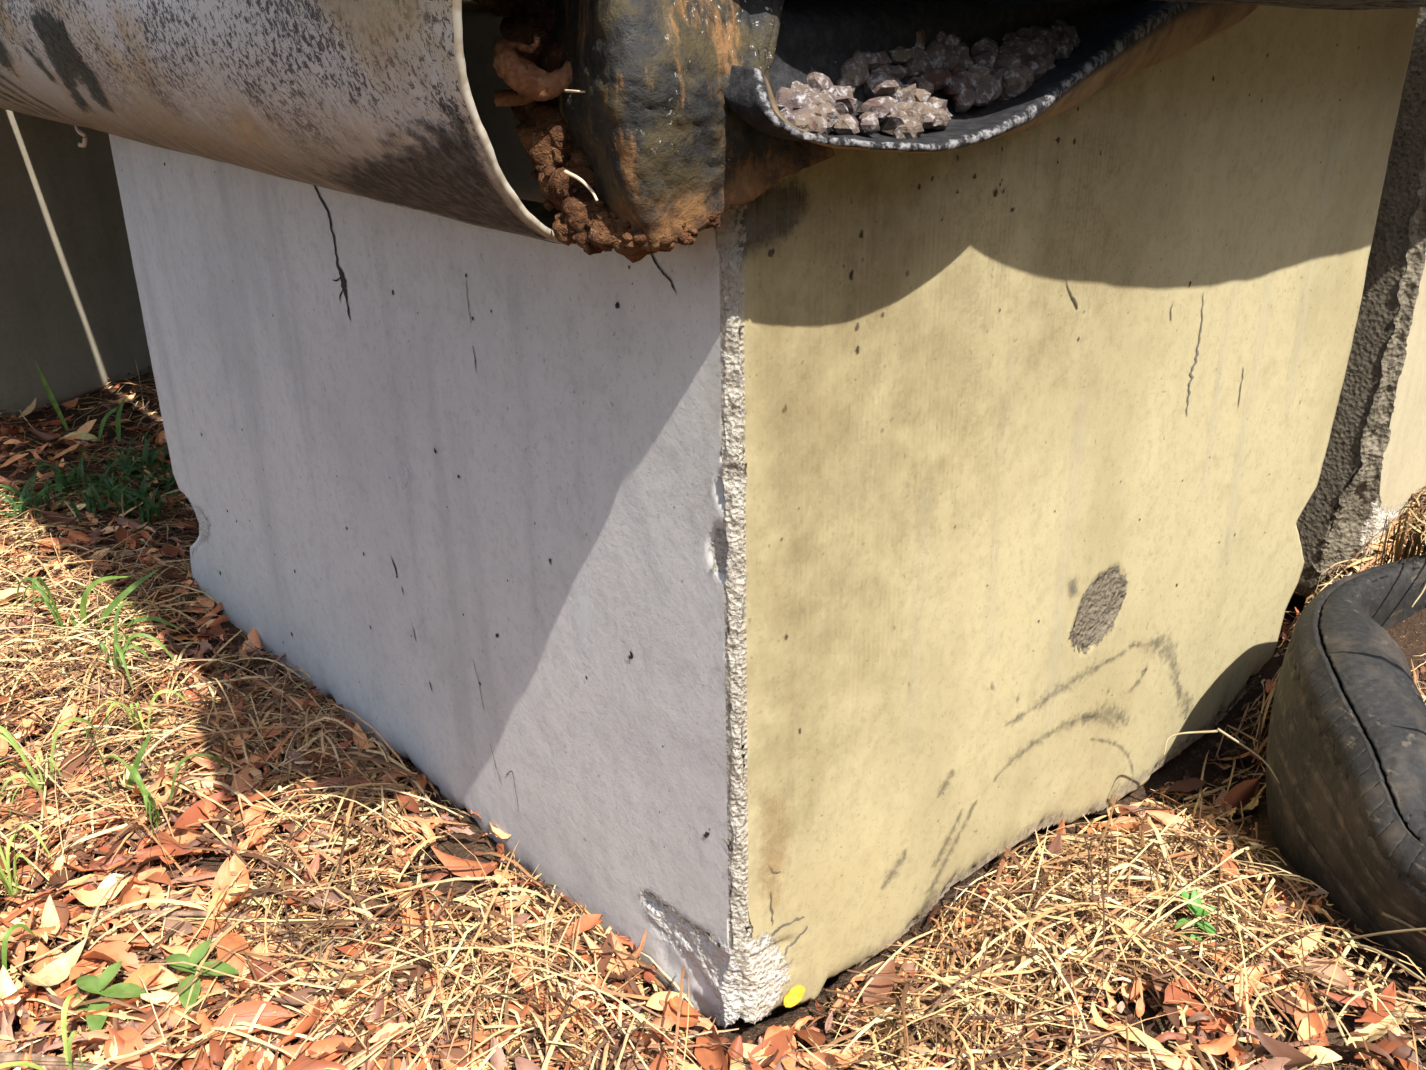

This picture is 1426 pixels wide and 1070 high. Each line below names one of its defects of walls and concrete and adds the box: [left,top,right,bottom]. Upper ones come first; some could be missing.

crack [313,185,350,319]
spalling [639,203,793,1027]